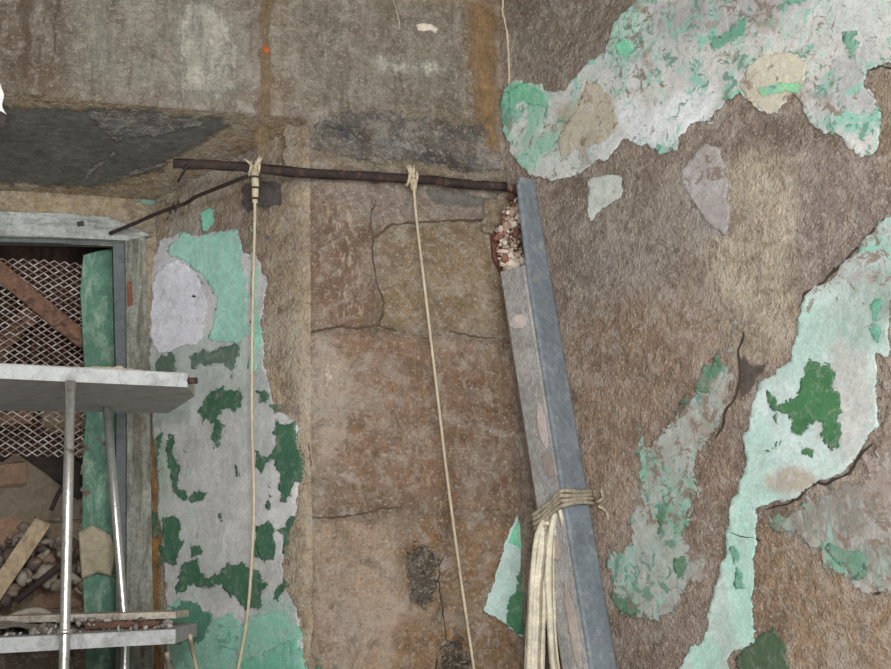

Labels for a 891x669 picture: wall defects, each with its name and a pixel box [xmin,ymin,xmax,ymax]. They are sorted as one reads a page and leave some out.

peeling [309,0,891,221]
peeling [681,144,730,236]
crack [311,200,484,334]
peeling [149,208,323,669]
crack [313,506,402,519]
crack [450,331,495,339]
crack [715,331,745,438]
peeling [605,216,891,669]
crack [764,444,873,510]
crack [435,553,447,669]